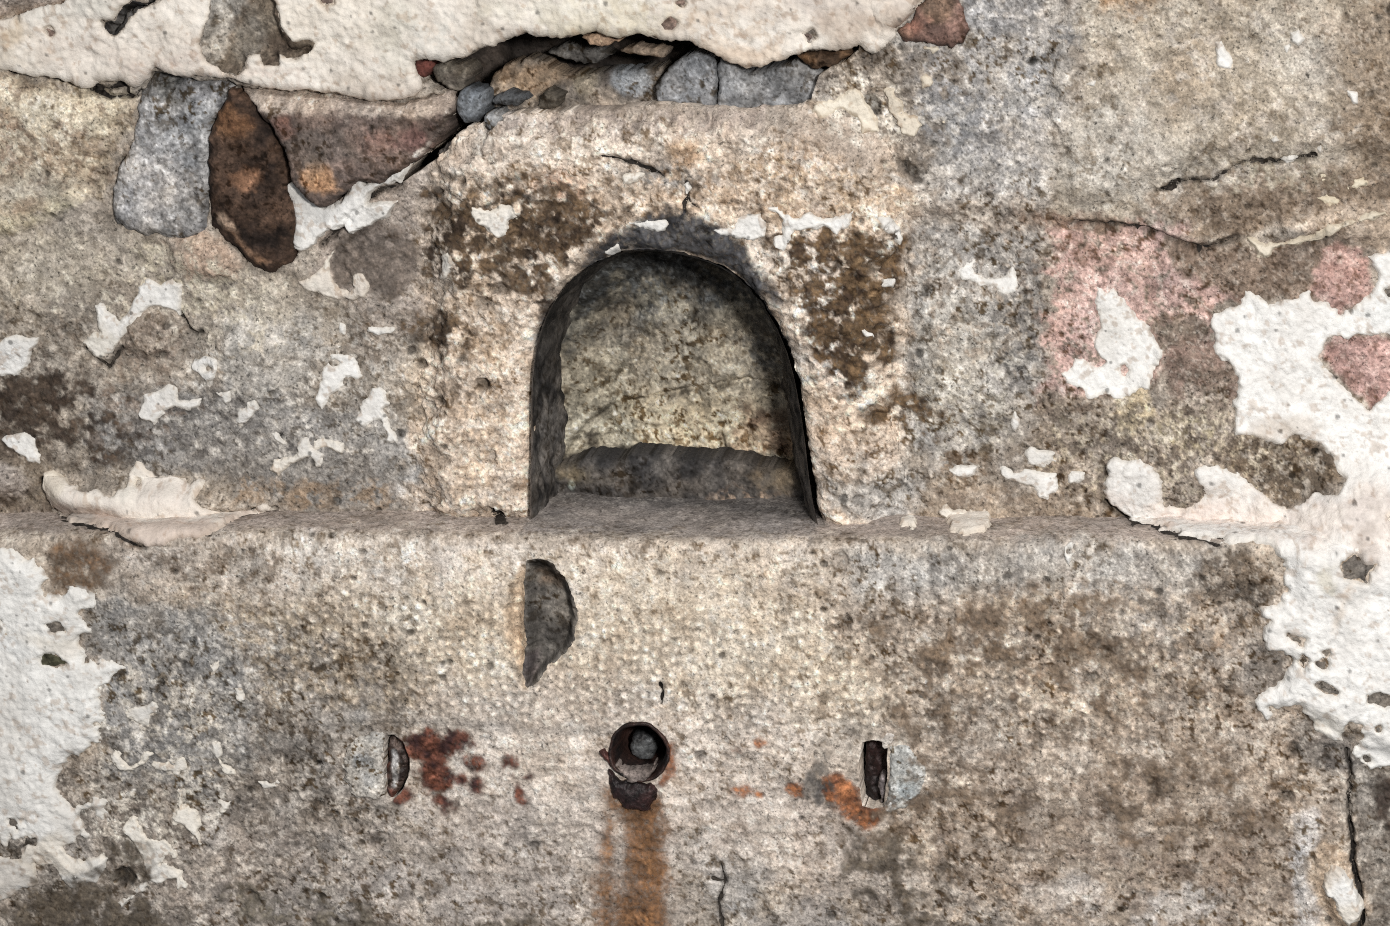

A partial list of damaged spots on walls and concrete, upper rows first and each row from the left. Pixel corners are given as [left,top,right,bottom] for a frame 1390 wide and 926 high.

peeling [0,0,923,102]
crack [1156,151,1317,191]
crack [1078,220,1150,229]
crack [1197,237,1233,252]
peeling [1061,287,1163,399]
peeling [1103,250,1390,770]
peeling [0,547,202,908]
rust [393,727,485,814]
rust [503,754,533,805]
rust [596,744,676,926]
rust [821,774,883,829]
crack [1346,747,1365,926]